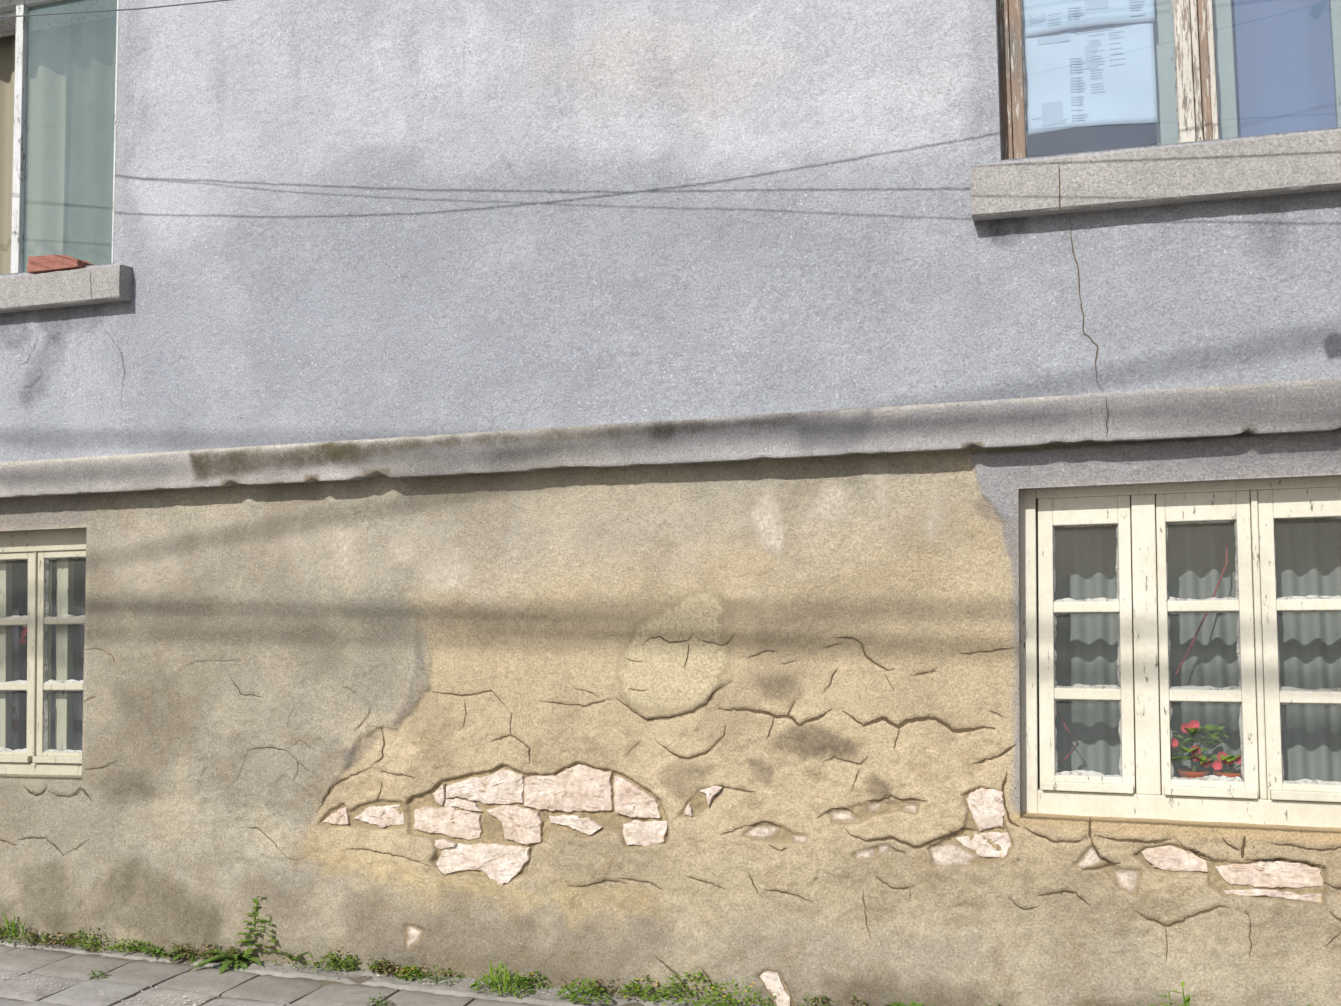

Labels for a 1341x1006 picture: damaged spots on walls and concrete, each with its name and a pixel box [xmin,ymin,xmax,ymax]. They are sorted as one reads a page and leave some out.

crack [1058,162,1109,438]
leakage [273,441,421,465]
crack [431,690,530,764]
crack [25,760,117,800]
crack [546,634,1341,947]
crack [0,837,87,855]
crack [342,848,430,866]
spalling [319,762,723,886]
spalling [930,787,1013,867]
spalling [1073,844,1327,906]
crack [1135,905,1252,963]